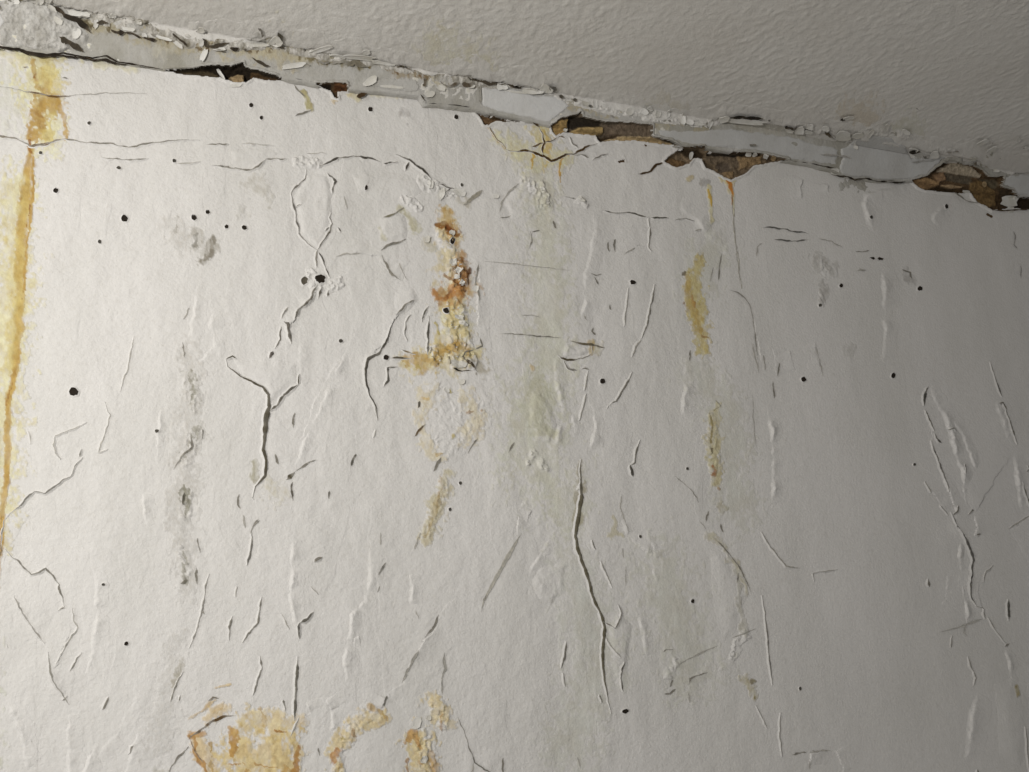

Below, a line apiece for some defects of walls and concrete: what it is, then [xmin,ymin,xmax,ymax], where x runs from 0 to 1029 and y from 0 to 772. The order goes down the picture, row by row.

damp [394,203,438,254]
flaking render [0,0,1029,218]
crack [0,0,1029,470]
crack [0,336,134,705]
crack [180,355,322,735]
damp [248,458,296,512]
crack [572,440,640,714]
damp [470,184,751,772]
crack [664,478,773,702]
damp [665,341,777,550]
crack [921,387,1010,686]
crack [169,697,231,772]